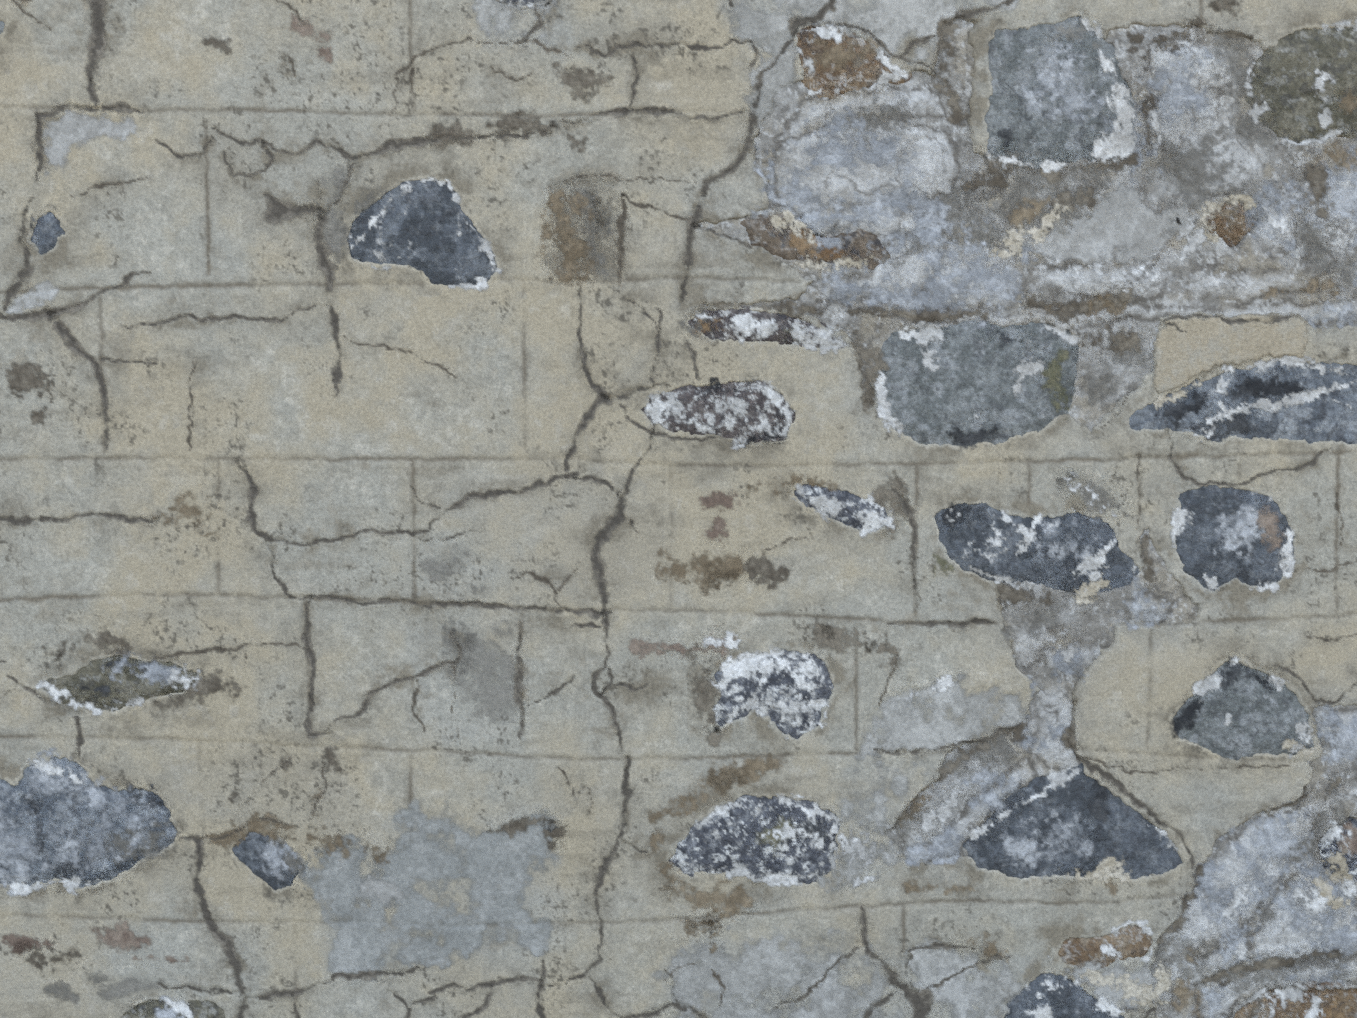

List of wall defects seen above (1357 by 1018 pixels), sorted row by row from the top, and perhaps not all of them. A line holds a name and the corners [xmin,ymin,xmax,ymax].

spalling [347,178,502,291]
spalling [680,0,1357,448]
crack [1156,314,1294,332]
spalling [641,378,795,450]
crack [0,0,1020,1018]
crack [1137,437,1323,521]
crack [1308,485,1350,572]
crack [1274,664,1356,705]
spalling [0,749,177,896]
spalling [654,484,1357,1018]
crack [1073,749,1195,869]
crack [1238,762,1290,770]